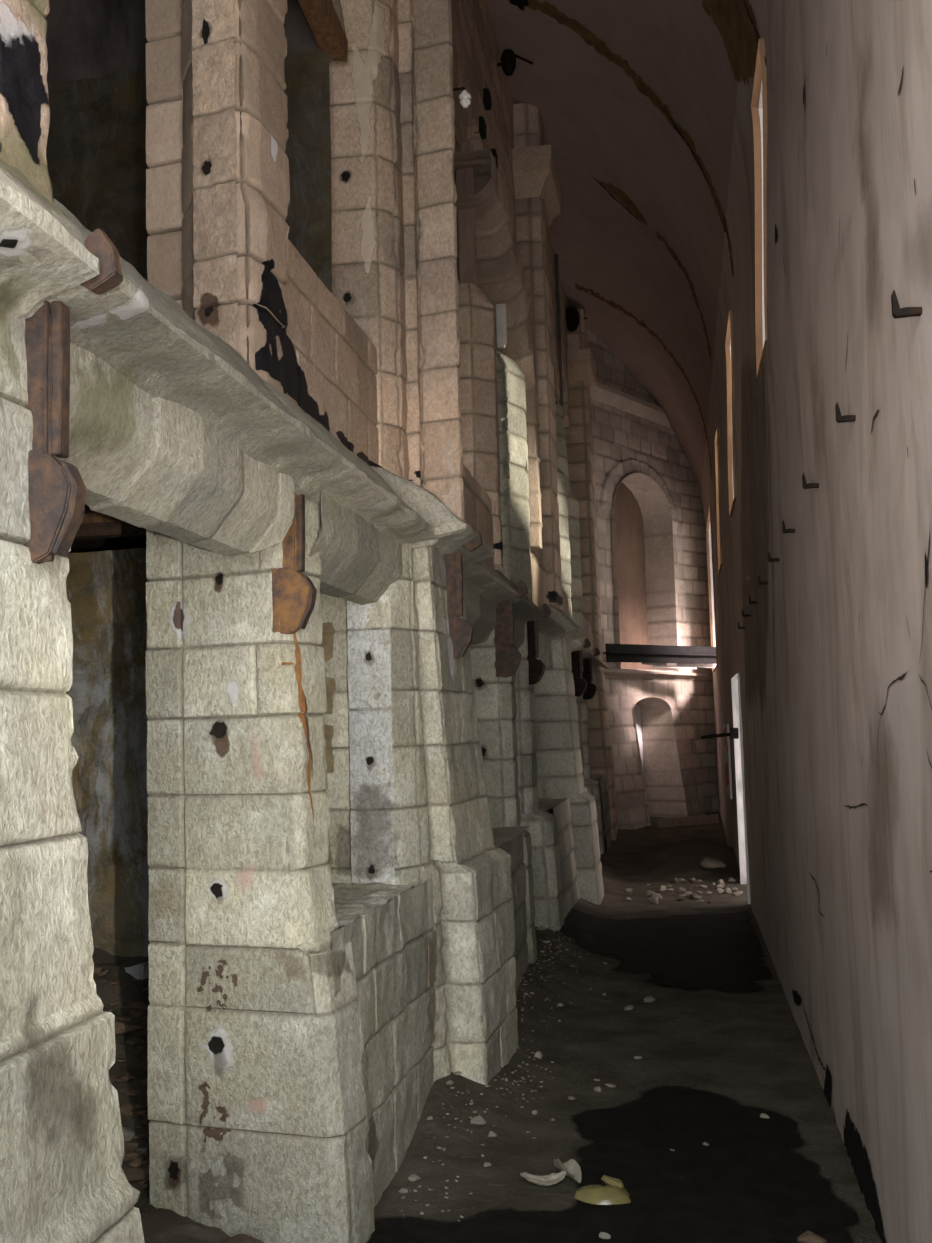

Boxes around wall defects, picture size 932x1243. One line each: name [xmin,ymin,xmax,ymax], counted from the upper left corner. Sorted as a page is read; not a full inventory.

peeling [0,32,49,164]
flaking render [702,0,766,84]
peeling [253,259,383,468]
corrosion [281,633,315,832]
crack [862,531,932,766]
corrosion [197,960,237,1011]